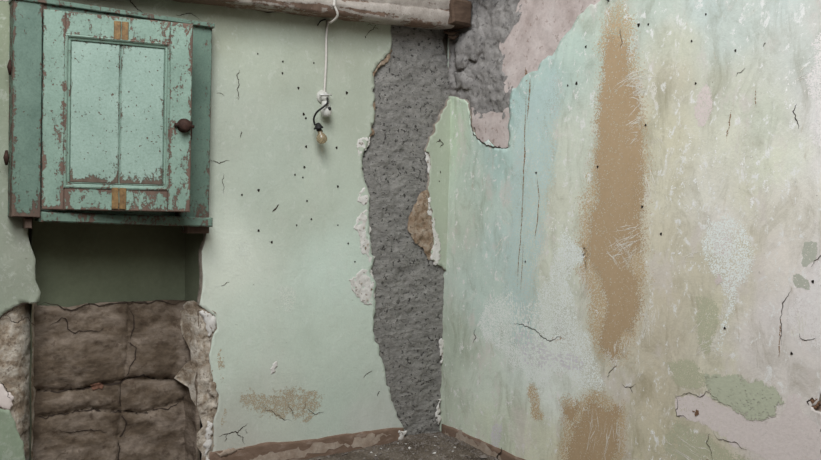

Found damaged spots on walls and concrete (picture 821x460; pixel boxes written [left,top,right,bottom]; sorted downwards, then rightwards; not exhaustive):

flaking render [499,0,601,93]
flaking render [356,101,376,156]
flaking render [469,107,510,149]
flaking render [349,187,376,306]
flaking render [407,190,441,266]
flaking render [0,300,244,460]
leakage [239,386,325,423]
peeling [253,430,407,460]
peeling [675,373,821,460]